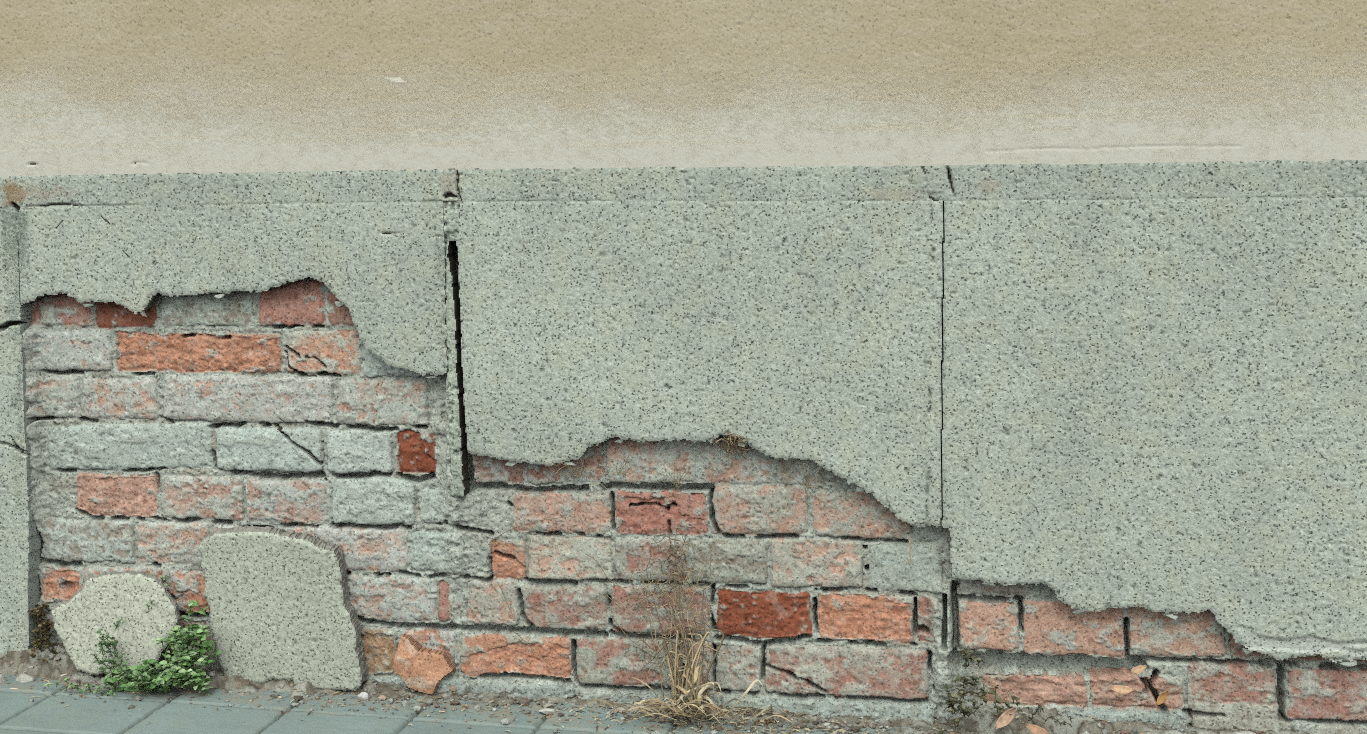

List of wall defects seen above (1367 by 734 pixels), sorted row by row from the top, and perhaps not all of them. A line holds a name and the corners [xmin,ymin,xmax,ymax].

spalling [117,293,280,375]
spalling [426,273,449,379]
spalling [398,430,437,474]
spalling [78,477,158,517]
spalling [617,496,707,536]
spalling [45,568,81,603]
spalling [174,589,210,613]
spalling [492,551,527,581]
spalling [717,588,913,641]
spalling [993,666,1184,714]